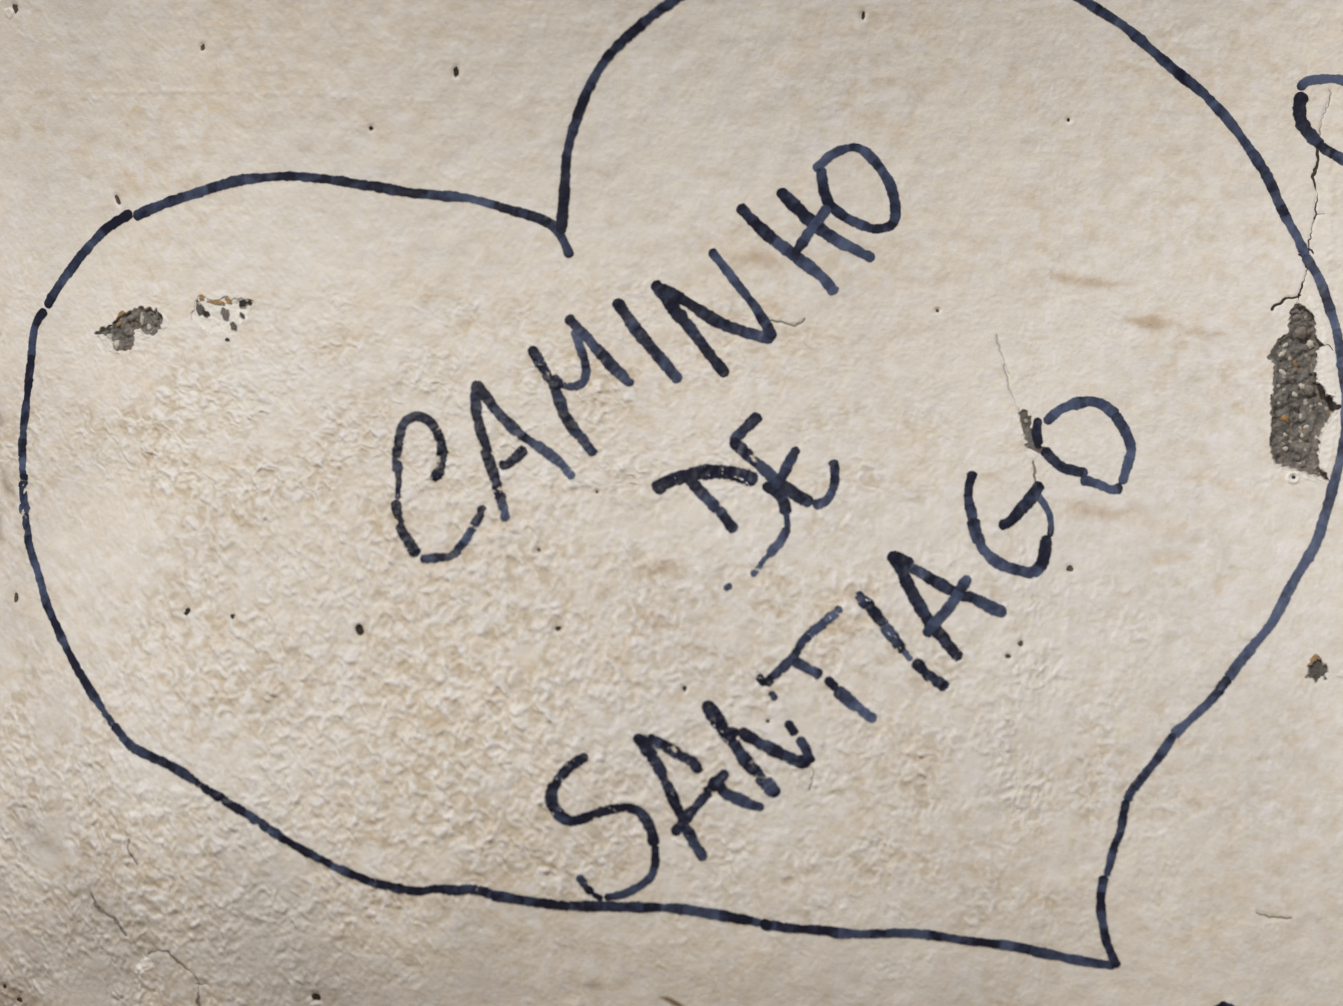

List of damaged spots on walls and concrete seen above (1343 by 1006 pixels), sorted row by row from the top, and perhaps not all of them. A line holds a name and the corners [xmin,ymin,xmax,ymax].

crack [1271,148,1325,311]
spalling [95,307,168,354]
spalling [192,295,253,341]
spalling [1268,295,1341,484]